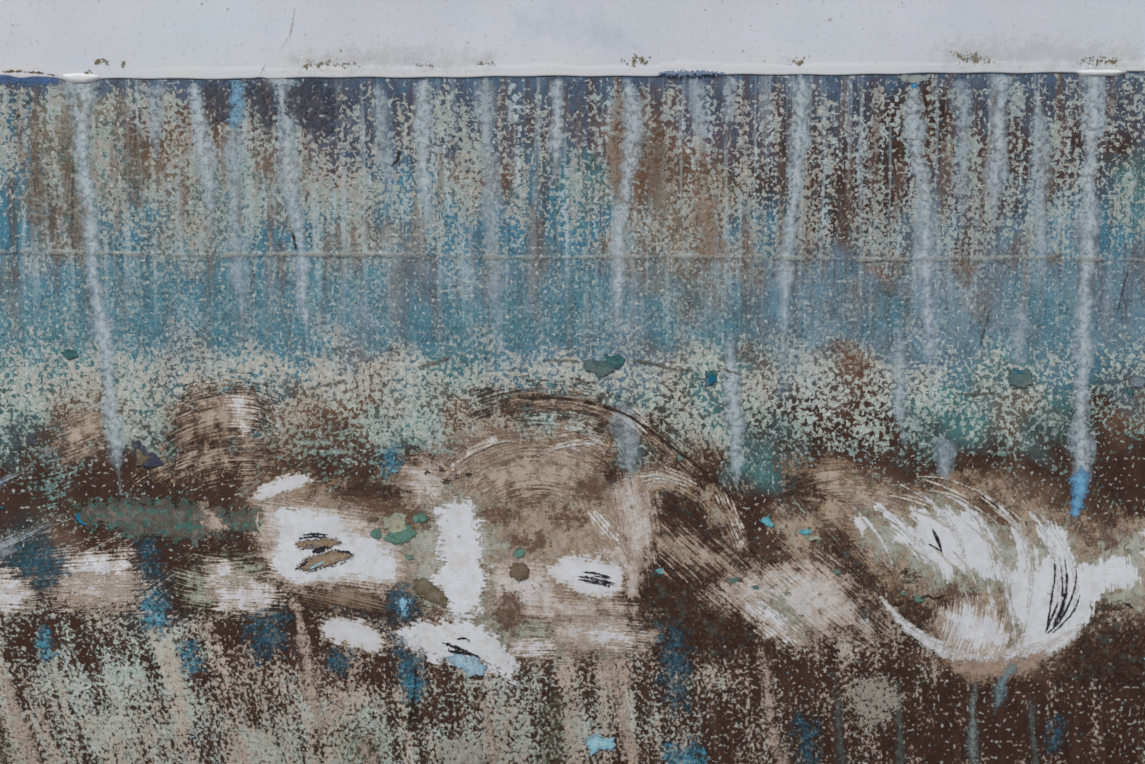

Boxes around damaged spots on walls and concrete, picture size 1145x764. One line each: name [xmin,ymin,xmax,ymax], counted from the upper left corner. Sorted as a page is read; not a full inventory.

leakage [64,58,125,466]
leakage [188,80,247,287]
leakage [270,79,309,330]
leakage [413,81,432,215]
leakage [549,80,563,164]
leakage [611,81,644,331]
leakage [778,56,810,330]
leakage [905,88,935,356]
leakage [950,50,994,66]
leakage [986,75,1008,213]
leakage [1070,54,1121,481]
leakage [724,344,744,480]